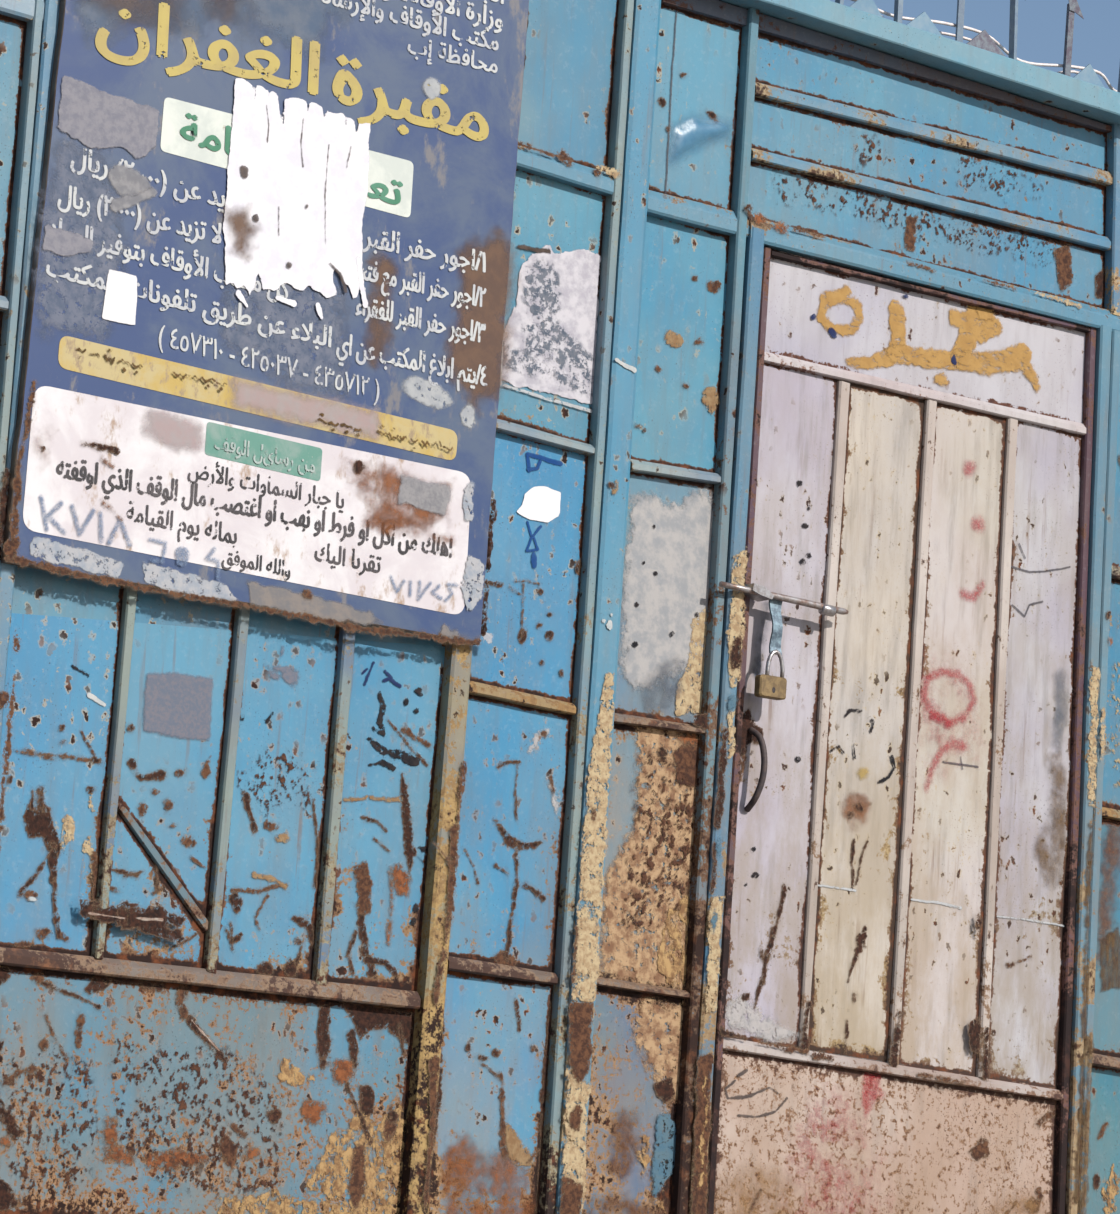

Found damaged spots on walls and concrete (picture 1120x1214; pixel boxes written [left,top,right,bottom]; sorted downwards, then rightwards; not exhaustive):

rust [774,175,1082,309]
rust [0,380,497,646]
peeling [675,607,707,716]
peeling [725,546,748,759]
rust [14,786,69,948]
rust [80,868,186,944]
rust [0,1014,283,1211]
rust [316,1002,415,1070]
rust [343,761,467,1005]
peeling [562,1070,592,1213]
peeling [571,672,698,1213]
rust [622,713,708,930]